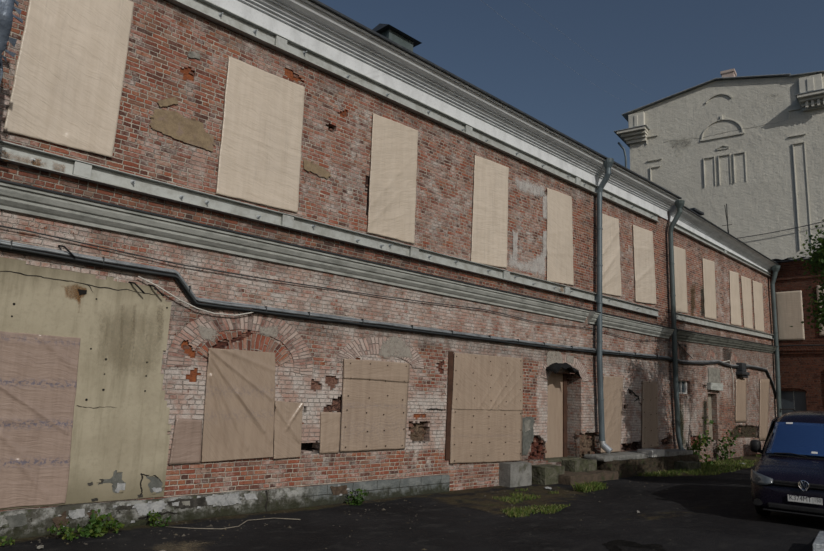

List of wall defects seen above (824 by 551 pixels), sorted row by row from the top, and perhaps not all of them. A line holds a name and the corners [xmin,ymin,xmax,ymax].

spalling [180,51,202,81]
spalling [284,68,303,82]
damp [516,178,547,219]
damp [509,231,547,274]
spalling [181,340,195,358]
spalling [186,368,201,382]
spalling [311,376,341,412]
spalling [408,414,427,441]
flaking render [522,416,547,460]
spalling [575,432,598,458]
flaking render [87,470,126,493]
peeling [108,474,258,527]